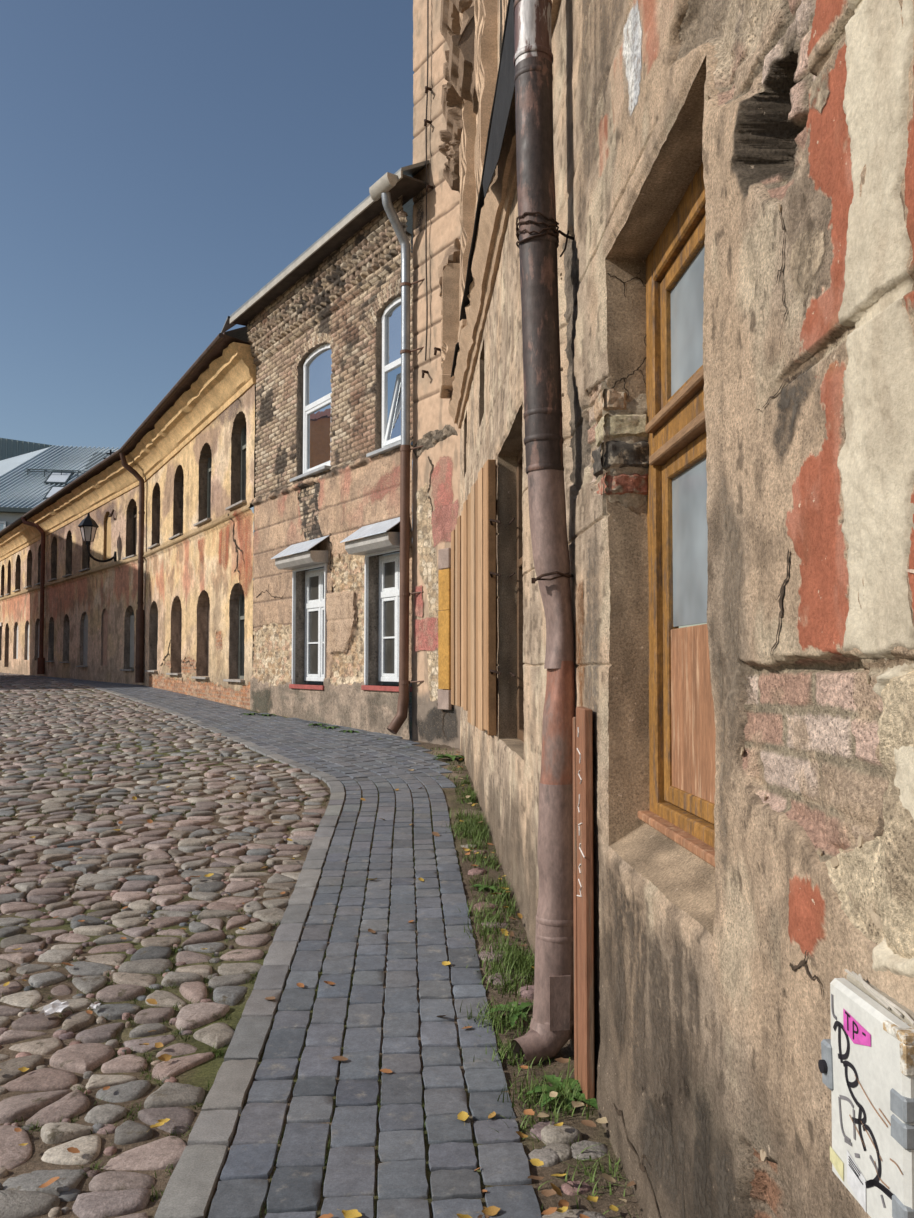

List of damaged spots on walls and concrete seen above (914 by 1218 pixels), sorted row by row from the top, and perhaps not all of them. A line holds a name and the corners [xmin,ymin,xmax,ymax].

flaking render [677,0,829,213]
flaking render [297,482,324,541]
flaking render [413,424,459,701]
flaking render [740,654,914,959]
damp [604,871,734,1218]